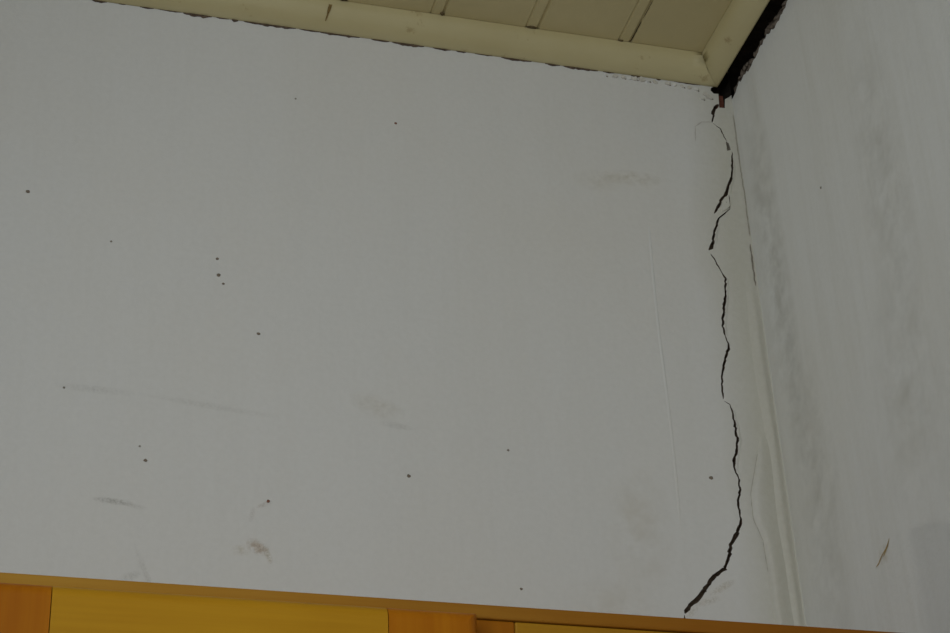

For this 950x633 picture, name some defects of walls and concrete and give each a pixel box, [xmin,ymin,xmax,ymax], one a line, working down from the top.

crack [92,0,756,618]